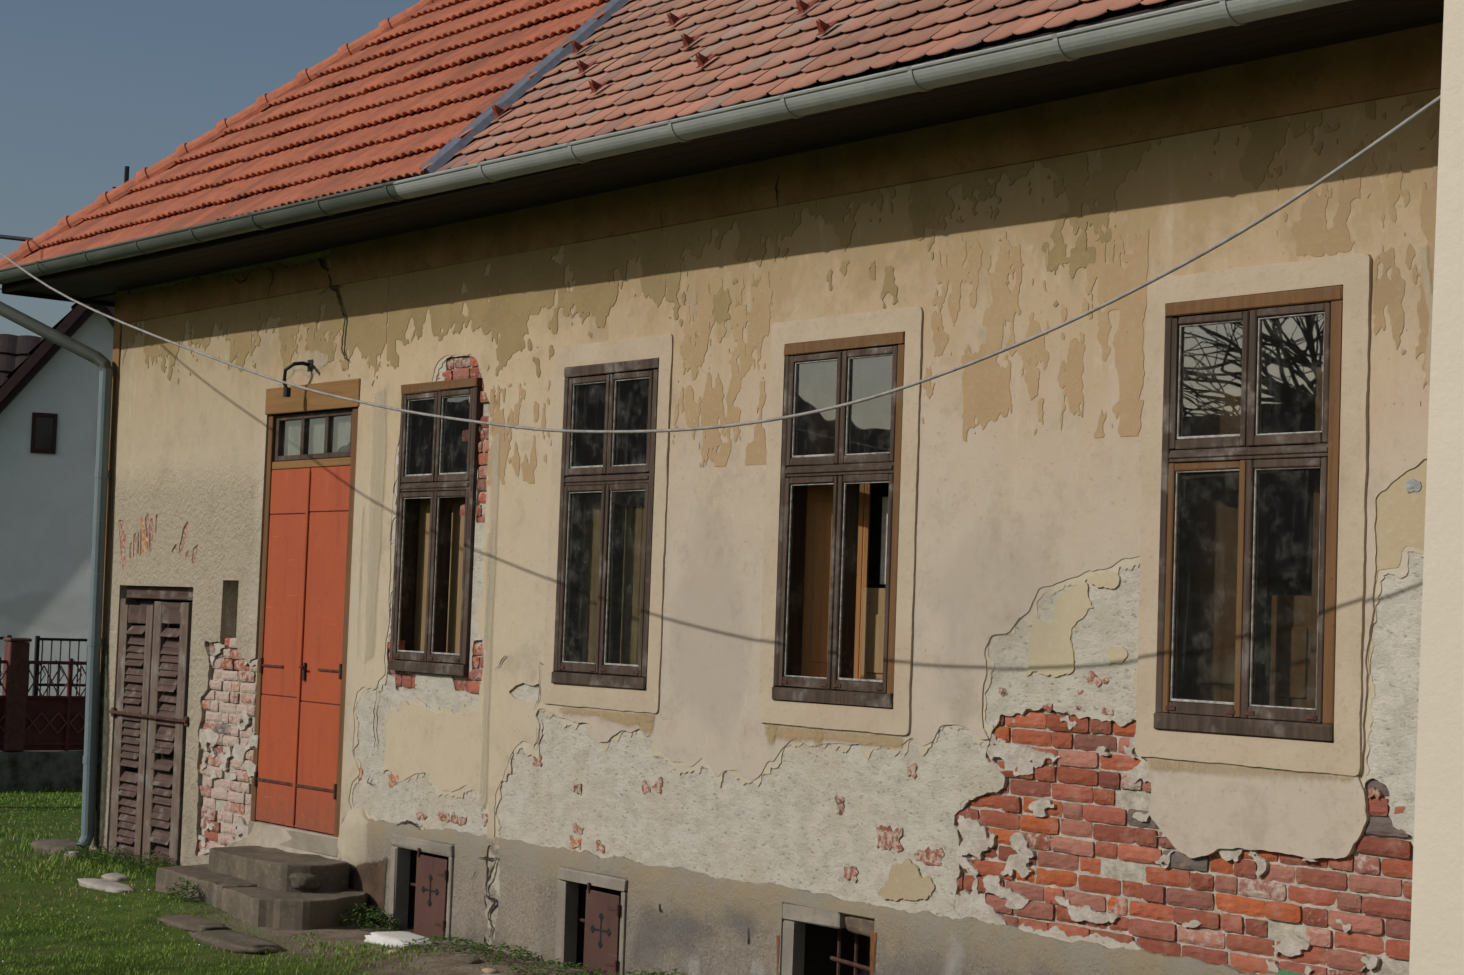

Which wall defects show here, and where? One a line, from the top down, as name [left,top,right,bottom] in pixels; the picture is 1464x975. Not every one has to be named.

crack [319,272,348,361]
peeling [1208,89,1441,406]
flaking render [119,139,1427,975]
crack [471,856,498,941]